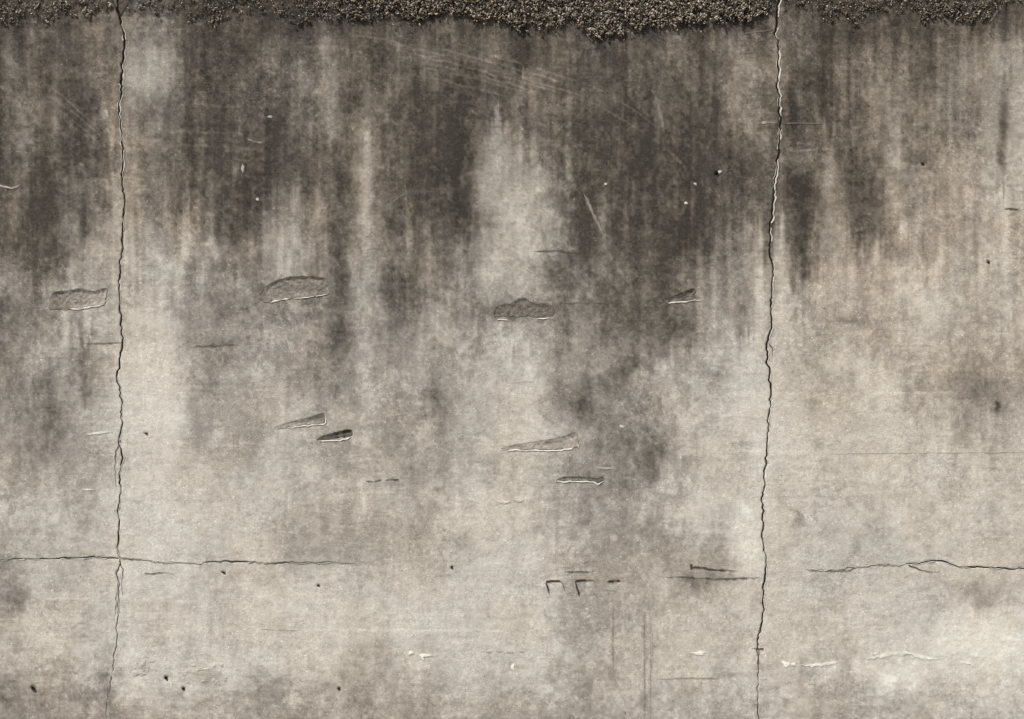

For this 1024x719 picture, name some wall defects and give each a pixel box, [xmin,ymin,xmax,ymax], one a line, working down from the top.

damp [16,73,102,263]
damp [181,108,317,234]
damp [381,62,481,235]
damp [559,40,719,334]
spalling [49,289,107,310]
crack [0,0,354,719]
spalling [261,277,330,303]
spalling [494,298,554,321]
crack [663,0,782,717]
spalling [273,414,352,442]
spalling [501,432,580,452]
crack [808,559,1024,572]